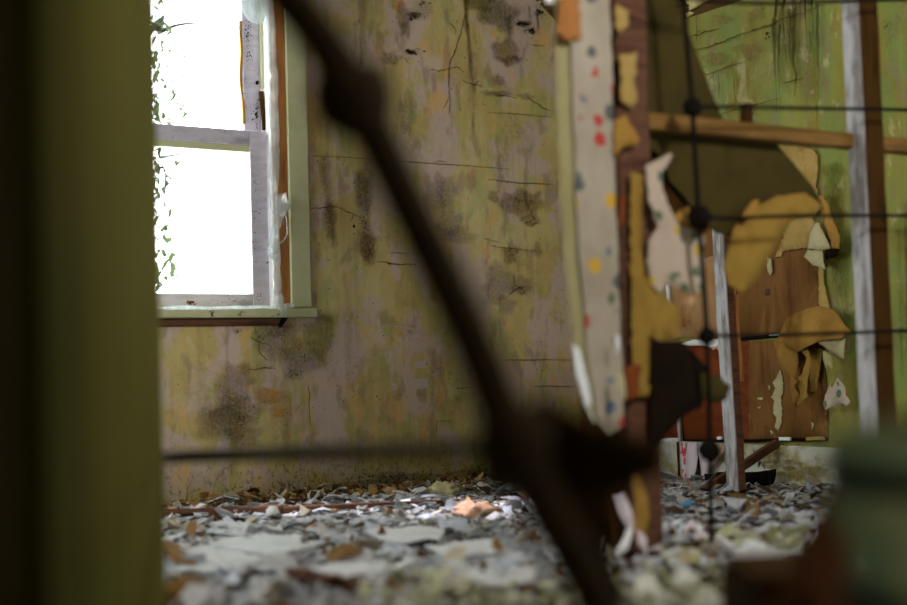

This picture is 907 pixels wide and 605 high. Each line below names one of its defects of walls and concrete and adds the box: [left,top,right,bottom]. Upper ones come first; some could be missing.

peeling [557,0,584,41]
peeling [686,0,704,17]
water stain [762,0,819,75]
crack [429,14,548,117]
crack [412,160,552,185]